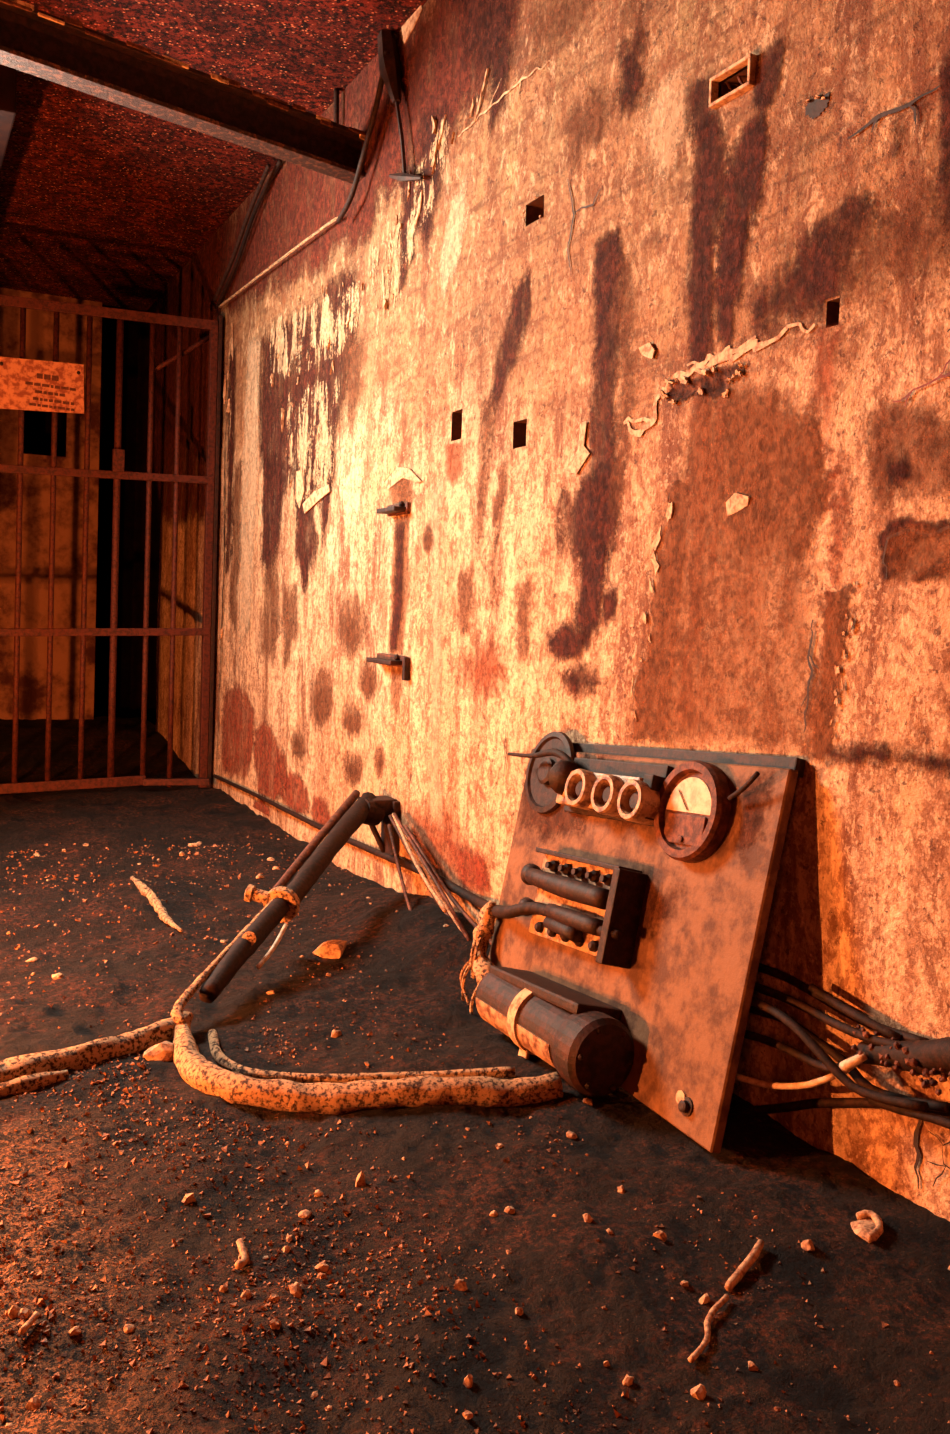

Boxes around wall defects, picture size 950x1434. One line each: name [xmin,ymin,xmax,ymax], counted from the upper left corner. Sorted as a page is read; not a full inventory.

crack [848,86,939,139]
damp [565,0,950,373]
damp [153,0,591,665]
spalling [658,363,743,405]
crack [893,329,950,407]
damp [545,228,634,698]
damp [631,383,950,779]
damp [467,641,505,695]
damp [345,747,383,788]